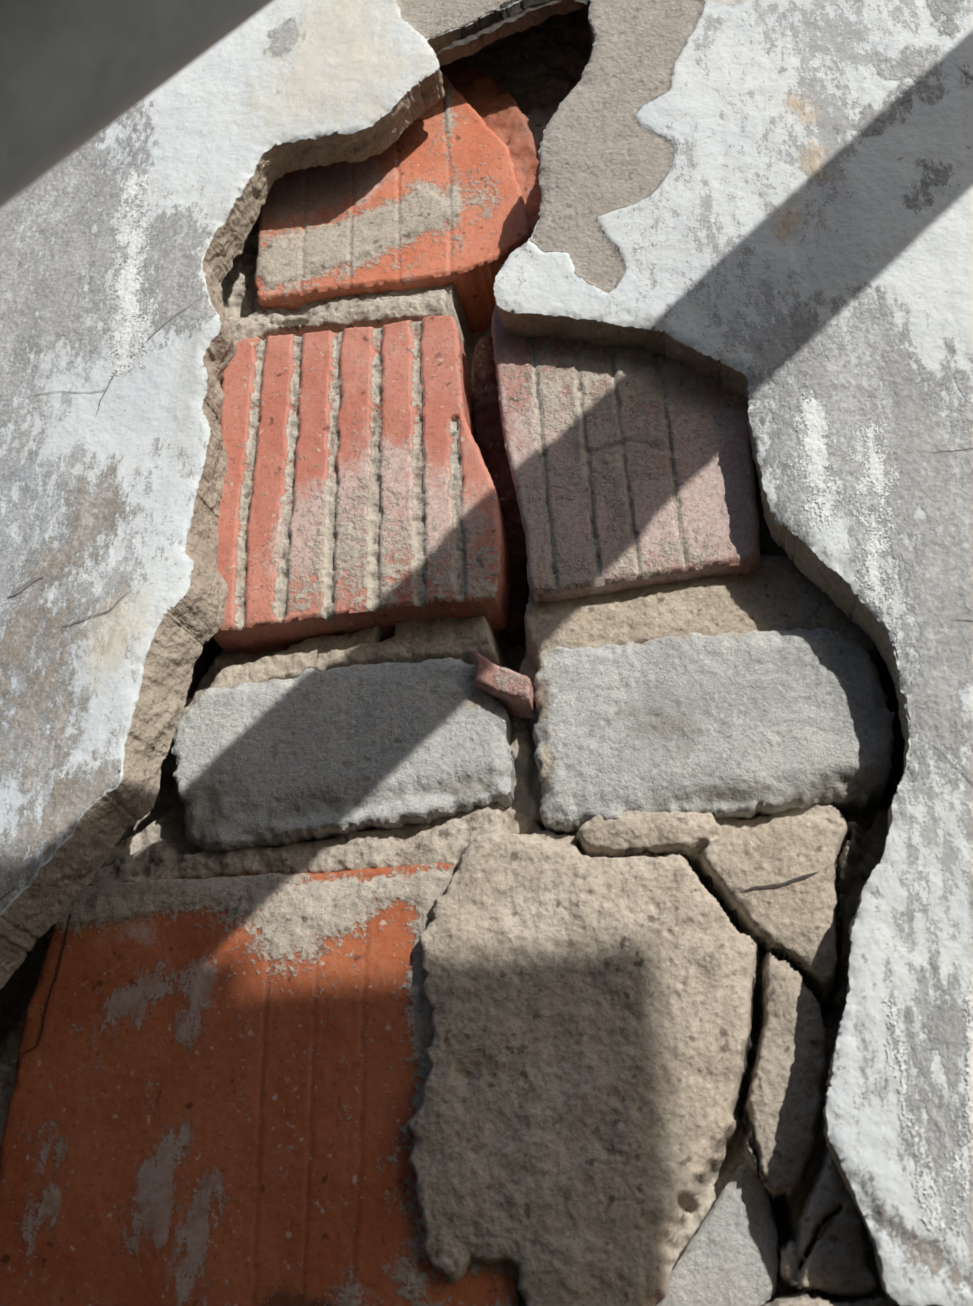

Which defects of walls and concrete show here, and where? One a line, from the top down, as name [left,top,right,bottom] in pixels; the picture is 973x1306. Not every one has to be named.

peeling [832,0,973,137]
peeling [904,159,959,212]
flaking render [0,0,706,989]
peeling [495,281,973,855]
peeling [823,940,973,1306]